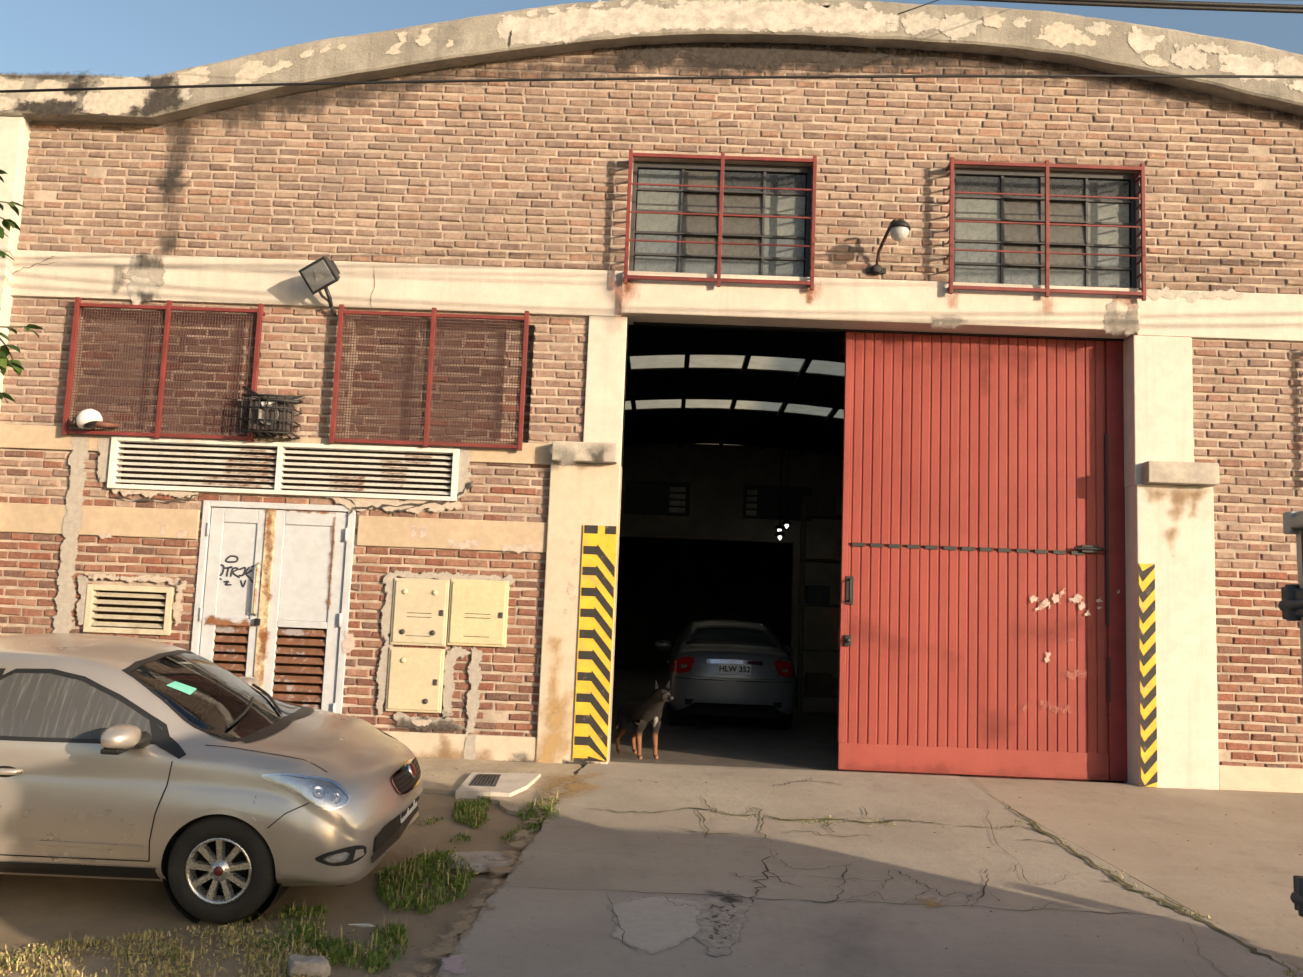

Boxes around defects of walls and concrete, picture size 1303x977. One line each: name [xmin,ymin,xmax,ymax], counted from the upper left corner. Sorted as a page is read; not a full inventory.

peeling [0,76,155,115]
peeling [177,66,211,100]
peeling [234,43,346,89]
peeling [385,27,454,55]
damp [477,42,1181,101]
peeling [495,0,1303,93]
damp [130,69,460,205]
damp [164,236,176,251]
peeling [113,254,165,305]
peeling [1030,589,1103,616]
crack [512,777,1302,977]
spalling [609,893,753,957]